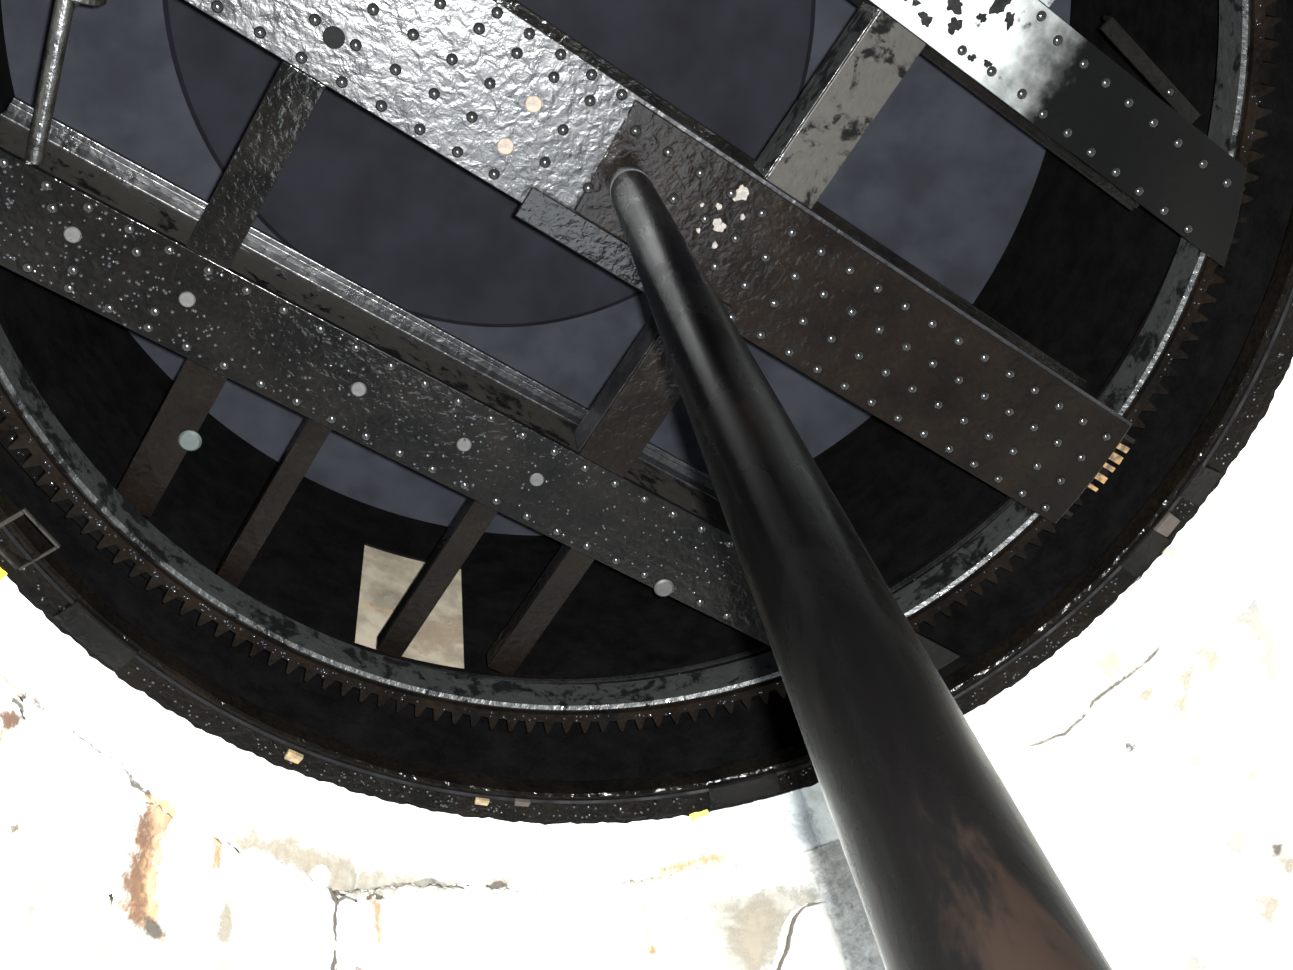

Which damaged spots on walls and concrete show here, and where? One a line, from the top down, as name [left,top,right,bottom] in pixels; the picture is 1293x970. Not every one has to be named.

rust [0,697,26,741]
crack [0,645,161,799]
crack [1020,648,1159,750]
rust [117,794,176,941]
crack [328,878,507,970]